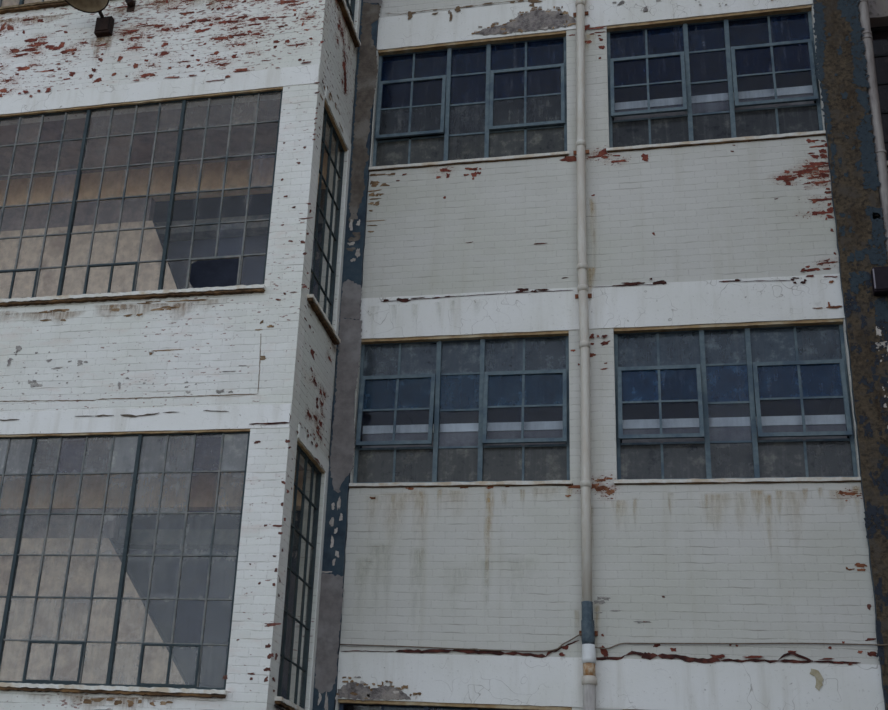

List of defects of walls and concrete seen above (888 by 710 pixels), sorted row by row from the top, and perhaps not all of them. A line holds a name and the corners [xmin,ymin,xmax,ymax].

flaking render [0,0,406,262]
spalling [471,6,605,59]
peeling [774,0,888,236]
peeling [800,206,888,539]
flaking render [285,279,421,710]
peeling [248,644,278,692]
crack [341,640,579,658]
crack [596,651,860,664]